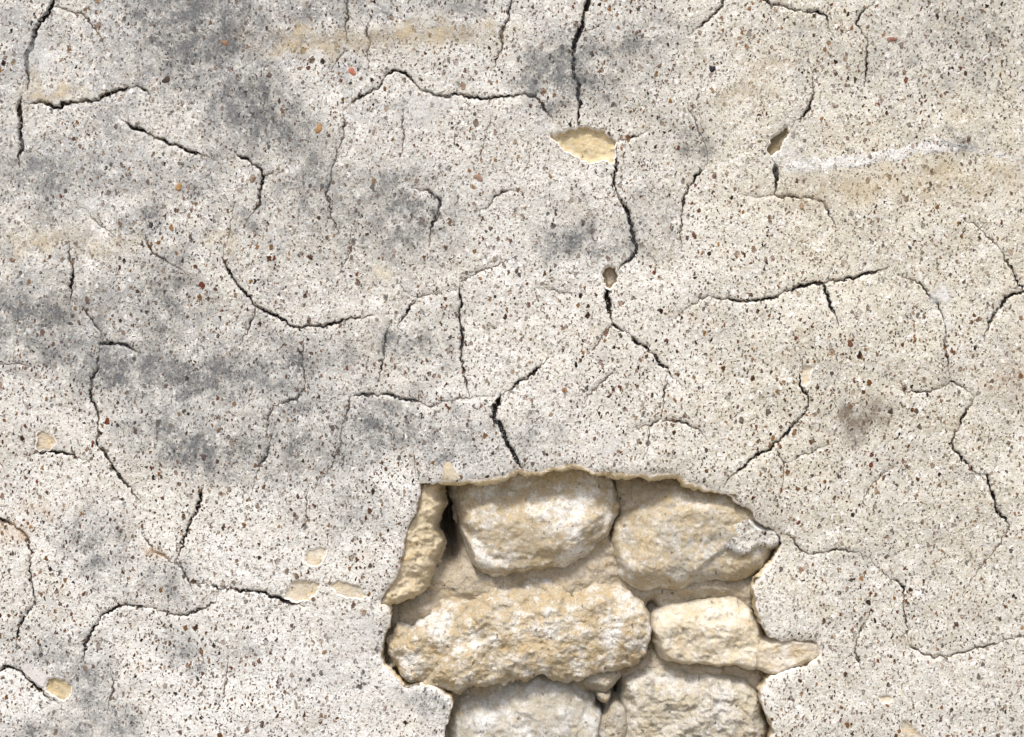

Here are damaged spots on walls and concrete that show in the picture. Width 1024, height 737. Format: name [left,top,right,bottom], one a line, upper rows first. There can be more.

crack [323,0,602,274]
spalling [549,125,617,165]
spalling [766,125,791,157]
crack [17,0,549,529]
crack [591,129,708,458]
crack [966,221,1024,342]
crack [676,266,1010,593]
crack [0,518,36,640]
spalling [21,664,72,702]
crack [83,484,305,661]
spalling [283,547,367,603]
flaking render [379,462,821,737]